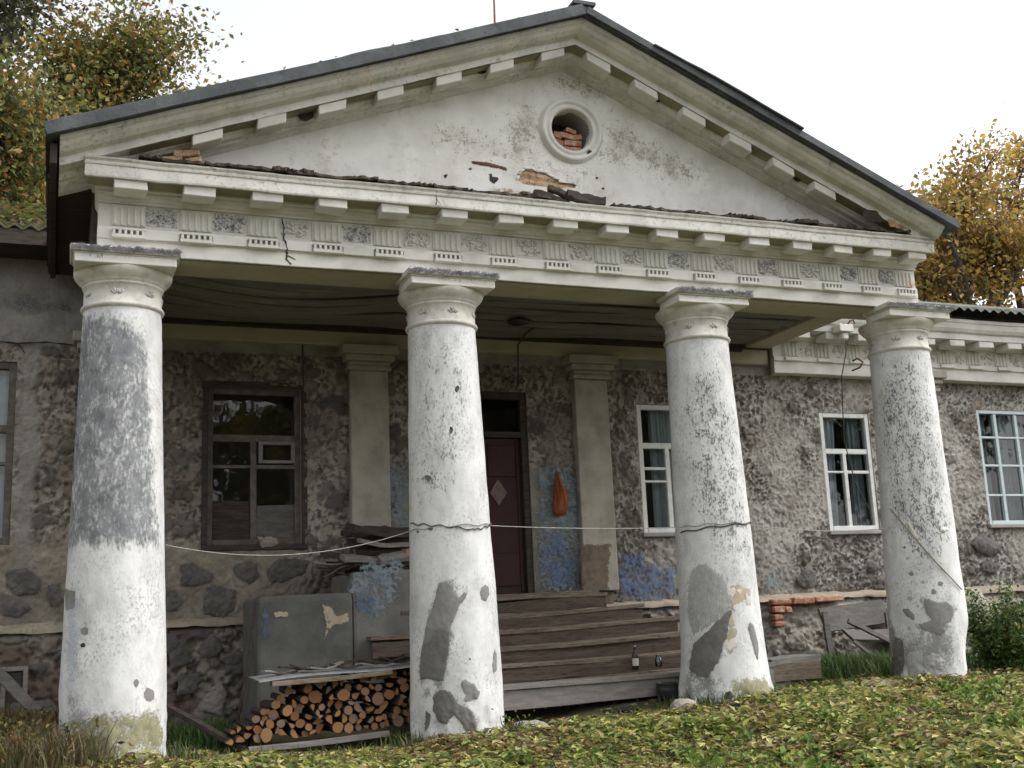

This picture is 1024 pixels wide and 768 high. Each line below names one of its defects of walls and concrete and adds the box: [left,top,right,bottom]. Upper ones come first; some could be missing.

spalling [469,161,577,188]
crack [281,218,295,265]
damp [68,314,159,549]
peeling [535,461,677,610]
peeling [322,557,405,639]
peeling [724,584,751,653]
spalling [424,680,480,732]